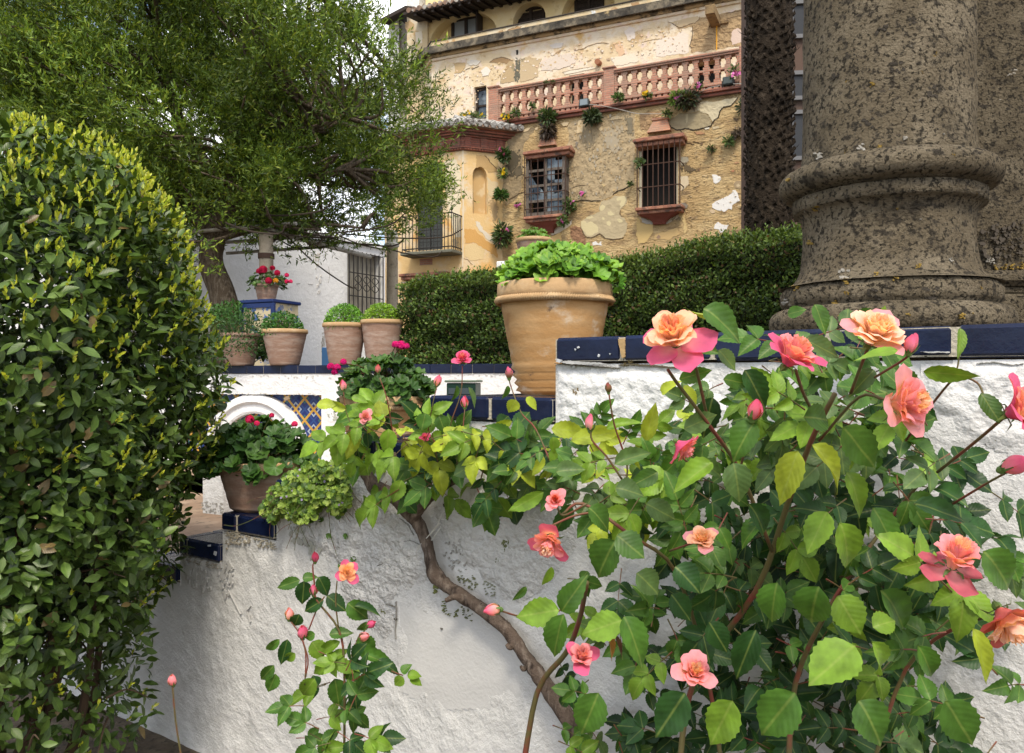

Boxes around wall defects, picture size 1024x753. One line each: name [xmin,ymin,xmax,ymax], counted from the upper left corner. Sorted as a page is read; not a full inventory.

spalling [467,49,521,77]
peeling [540,27,639,75]
crack [670,97,738,145]
spalling [551,195,628,249]
peeling [709,184,740,233]